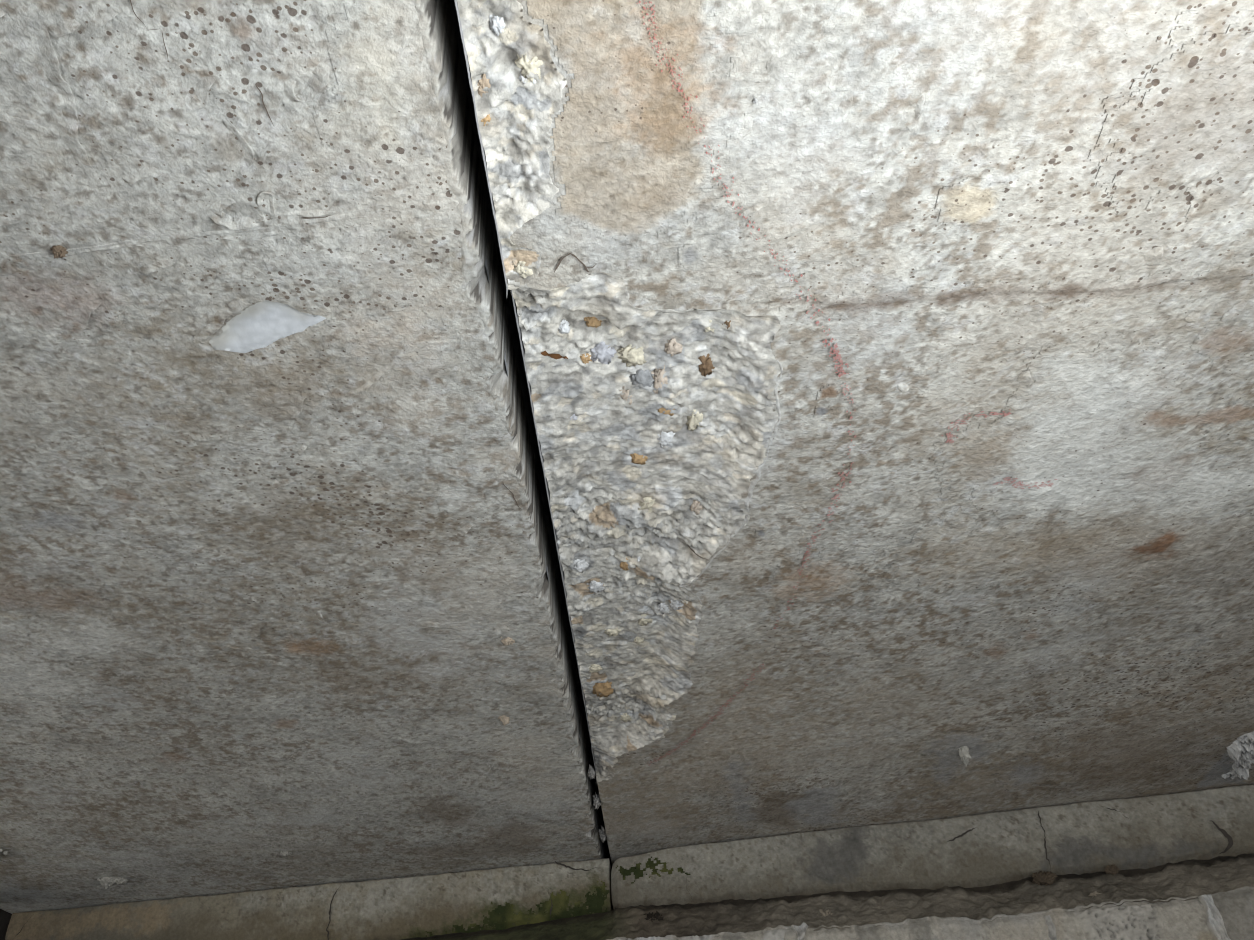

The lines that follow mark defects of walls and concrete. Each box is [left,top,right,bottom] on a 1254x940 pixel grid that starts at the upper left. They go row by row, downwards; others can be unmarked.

peeling [283,57,330,116]
peeling [206,191,336,230]
peeling [194,296,326,353]
spalling [412,0,783,858]
crack [1038,811,1051,869]
crack [326,888,339,940]